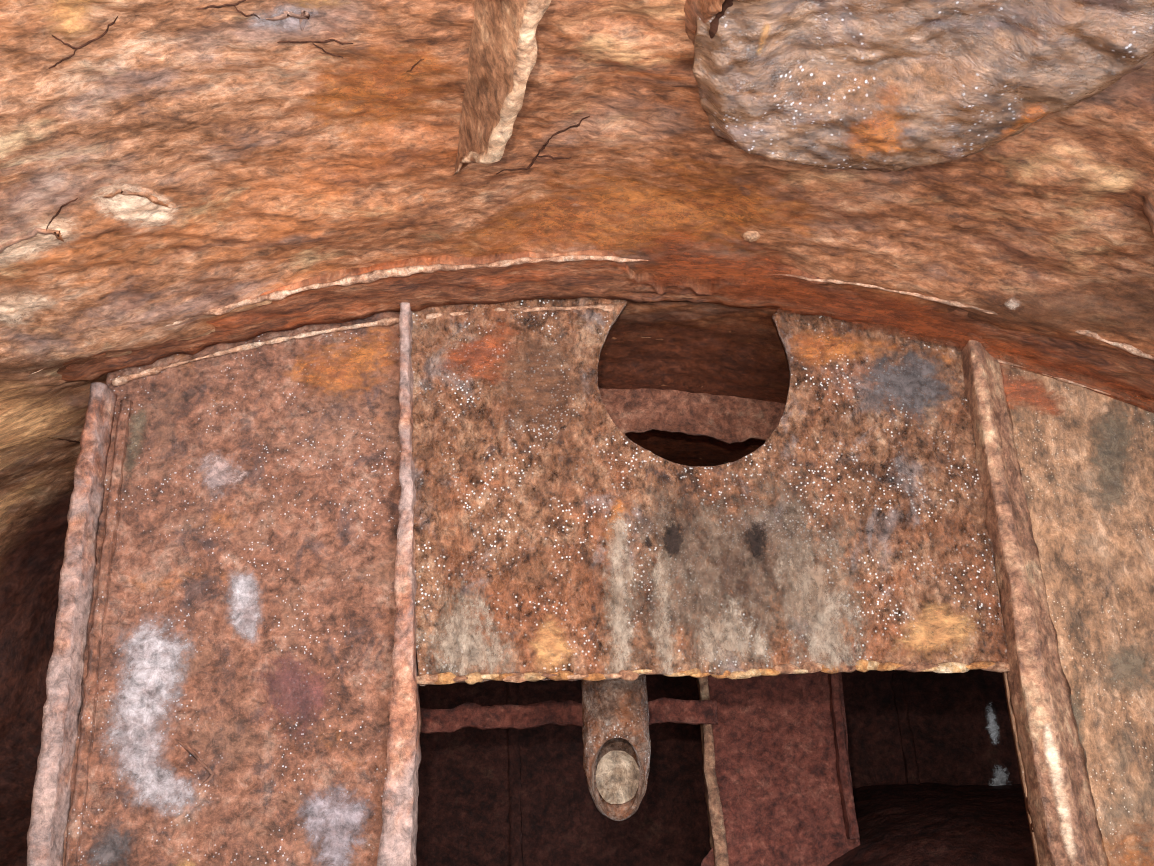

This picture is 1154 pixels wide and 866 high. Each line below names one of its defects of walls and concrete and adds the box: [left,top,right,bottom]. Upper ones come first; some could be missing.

crack [196,0,260,19]
crack [49,16,118,69]
crack [277,39,353,58]
peeling [453,0,551,176]
crack [496,116,590,175]
rust [464,163,1154,415]
leakage [0,360,87,470]
rust [626,430,765,467]
leakage [608,482,858,679]
rust [534,621,570,665]
rust [903,608,975,651]
leakage [0,484,74,866]